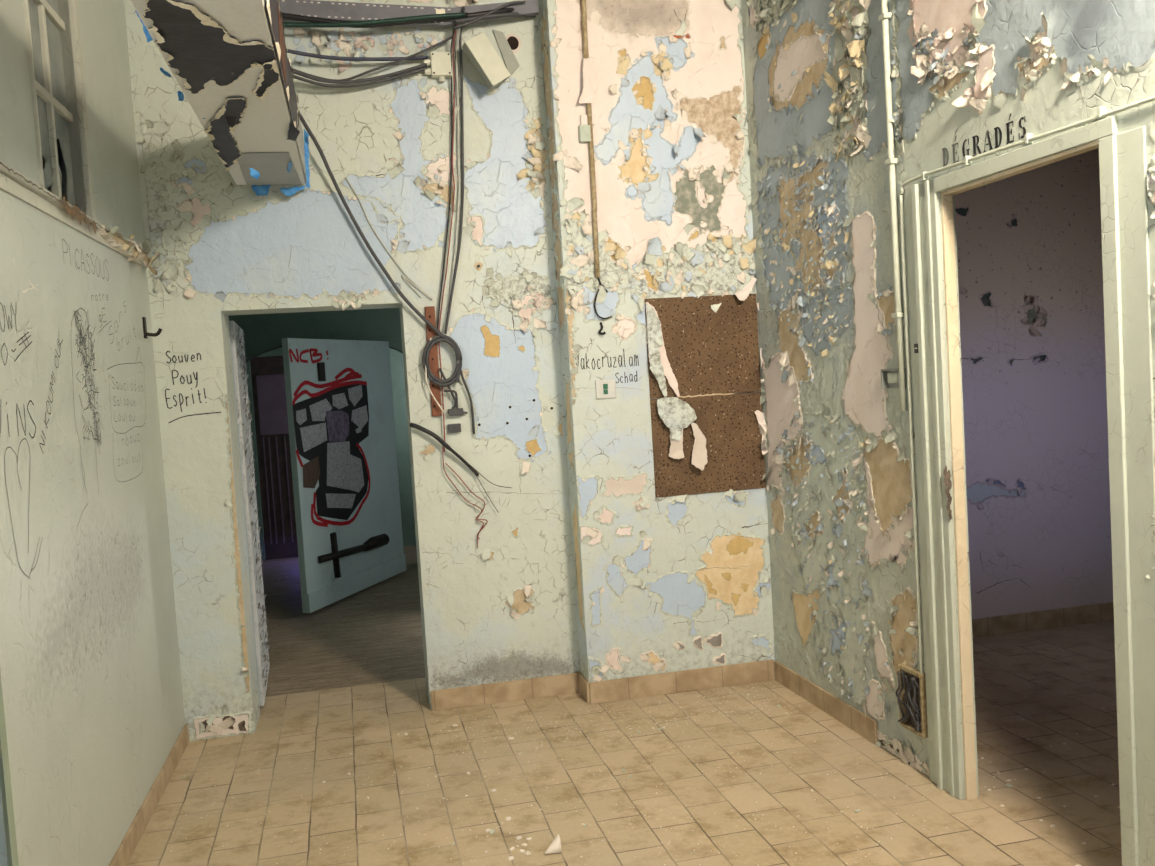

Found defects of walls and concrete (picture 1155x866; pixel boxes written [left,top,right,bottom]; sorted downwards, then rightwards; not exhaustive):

crack [0,161,144,254]
peeling [98,0,1155,720]
spalling [192,705,252,740]
spalling [872,729,929,775]